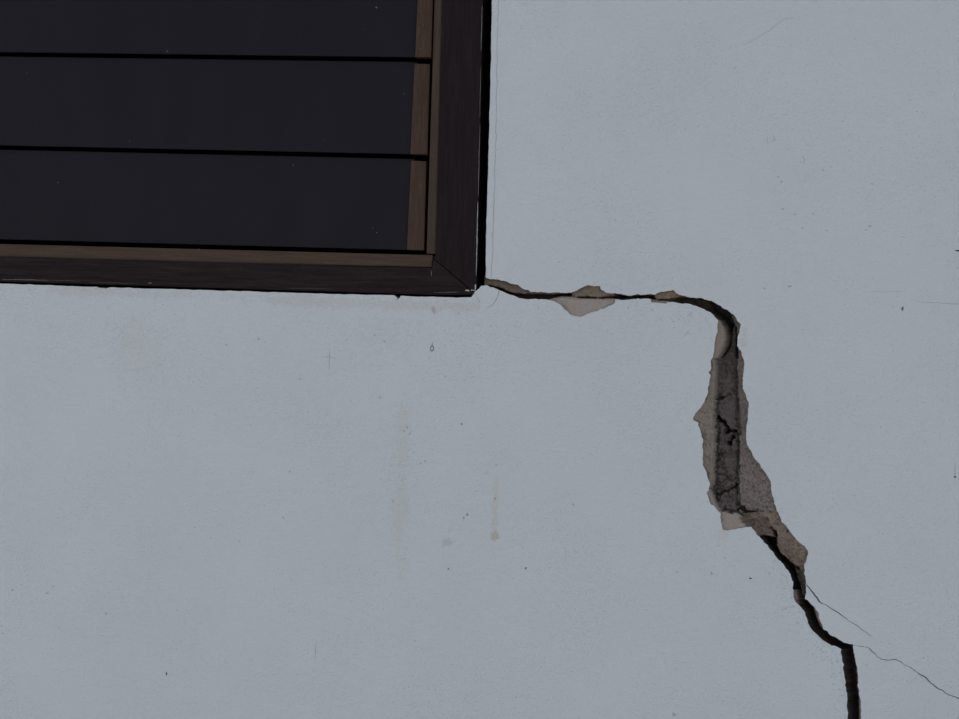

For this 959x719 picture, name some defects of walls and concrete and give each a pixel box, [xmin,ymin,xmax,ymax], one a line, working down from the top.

peeling [550,285,620,317]
crack [478,0,757,514]
spalling [693,313,808,604]
crack [760,535,959,719]